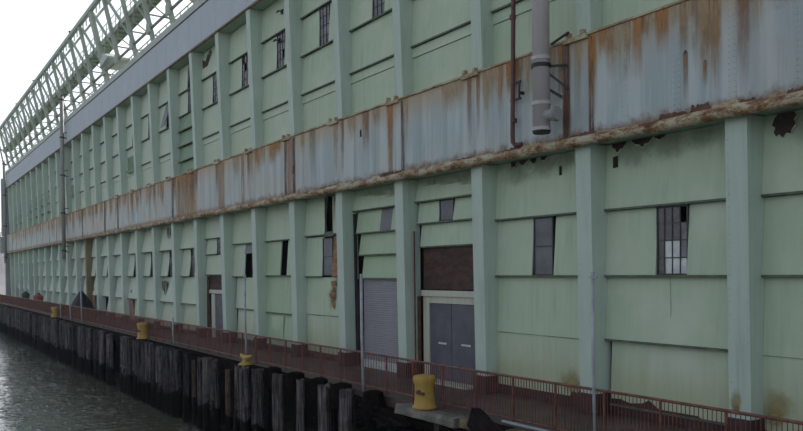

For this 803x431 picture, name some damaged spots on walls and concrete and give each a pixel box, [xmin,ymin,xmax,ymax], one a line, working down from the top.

rust [445,55,532,112]
rust [550,0,719,137]
rust [42,170,197,238]
rust [215,162,224,208]
rust [233,130,314,203]
rust [364,98,407,170]
peeling [612,135,665,153]
peeling [772,111,797,138]